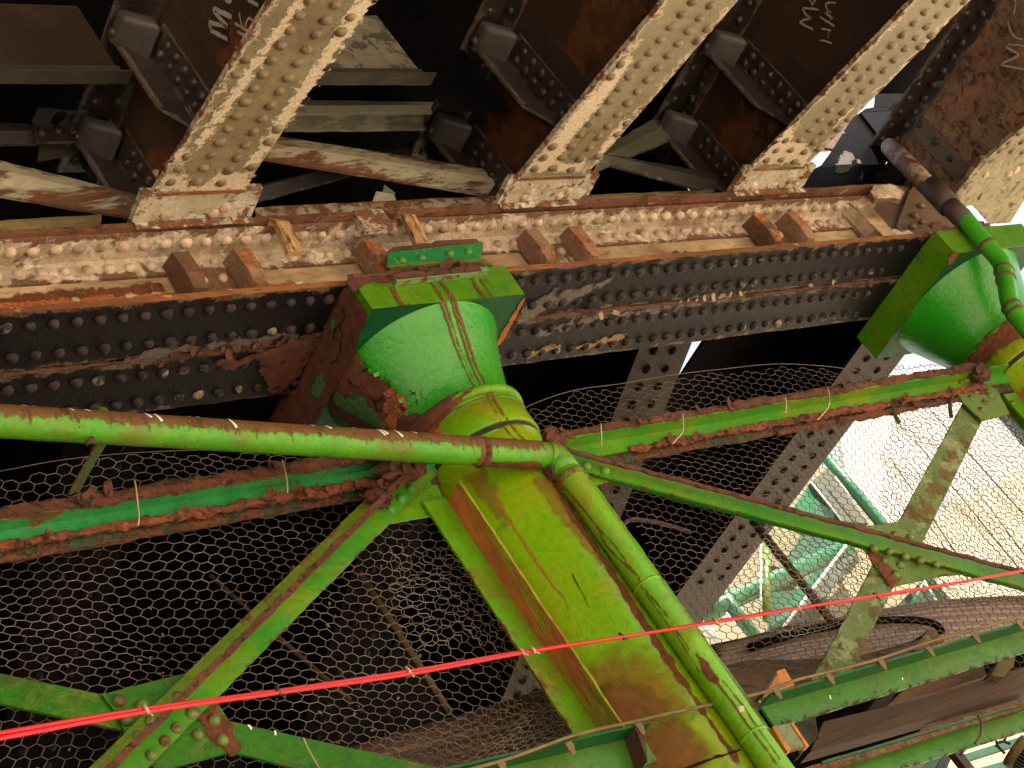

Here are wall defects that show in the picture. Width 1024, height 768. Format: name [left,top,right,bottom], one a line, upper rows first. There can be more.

peeling [152,0,375,193]
peeling [517,278,611,324]
peeling [533,290,753,337]
peeling [117,330,299,368]
rust [0,264,780,768]
rust [565,445,1024,575]
rust [866,549,901,588]